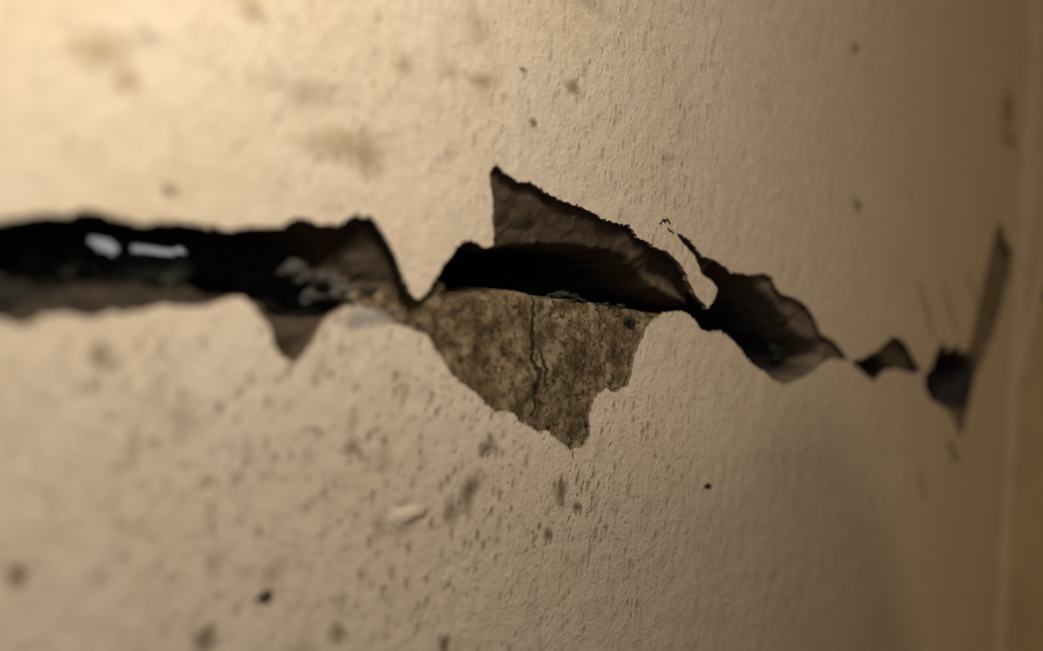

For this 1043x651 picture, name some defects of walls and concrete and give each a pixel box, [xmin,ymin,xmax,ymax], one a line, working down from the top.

flaking render [0,250,231,326]
crack [0,209,344,321]
crack [435,241,668,307]
flaking render [245,166,918,449]
crack [917,224,1012,464]